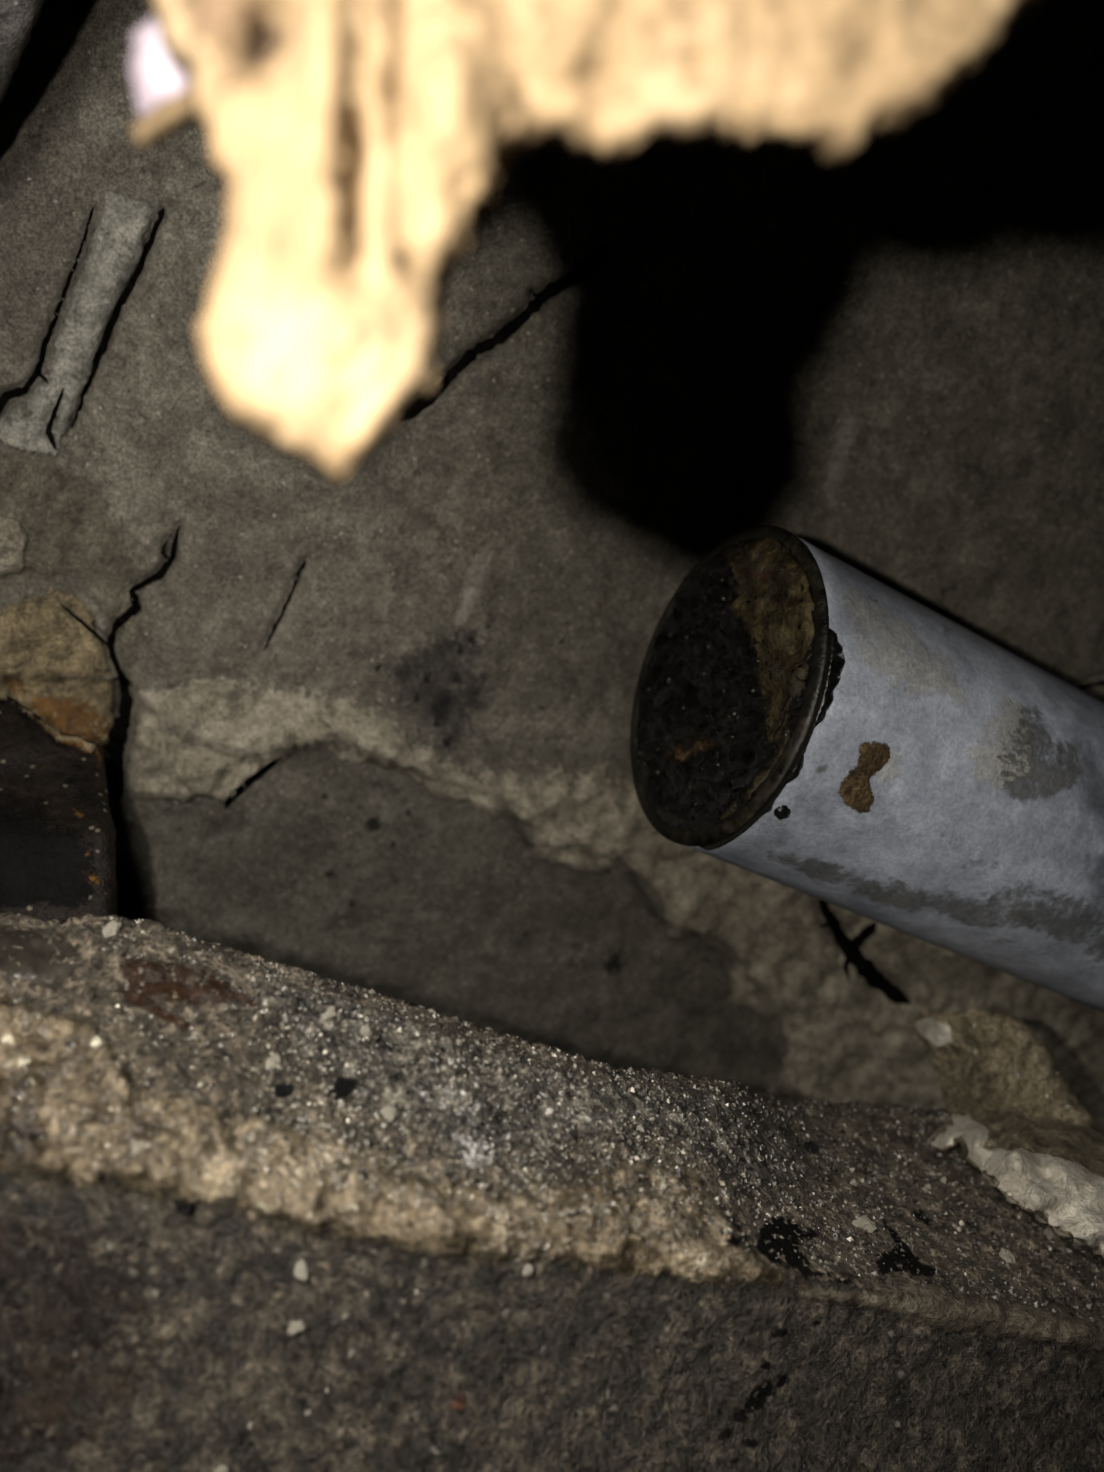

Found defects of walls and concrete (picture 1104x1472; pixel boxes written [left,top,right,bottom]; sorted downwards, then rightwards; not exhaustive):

crack [0,206,164,450]
crack [405,245,610,420]
crack [60,525,180,799]
crack [263,560,306,651]
corrosion [838,741,890,813]
crack [819,899,911,1005]